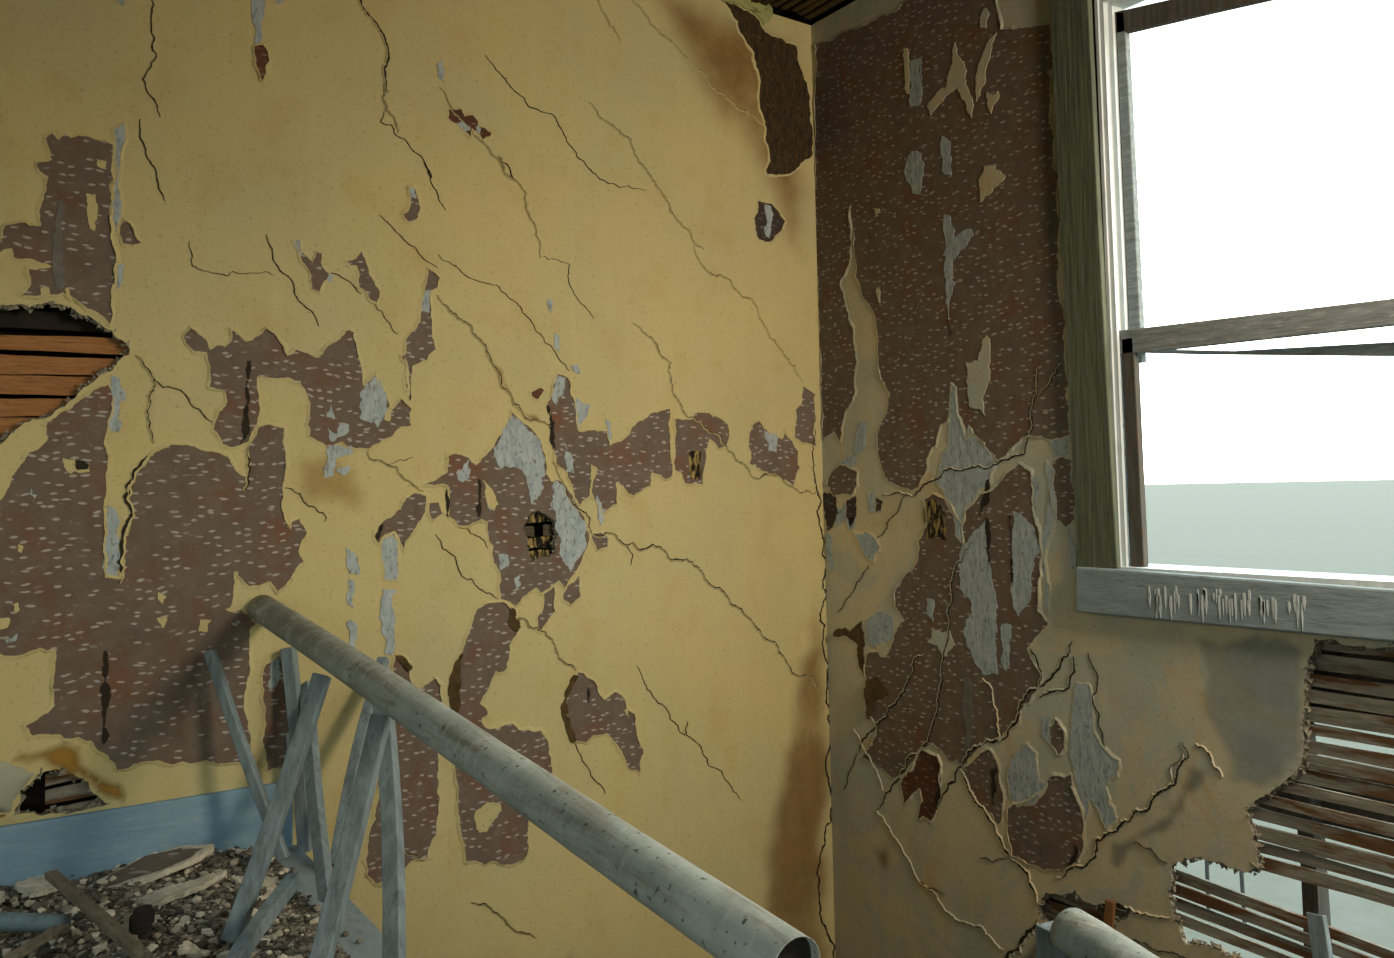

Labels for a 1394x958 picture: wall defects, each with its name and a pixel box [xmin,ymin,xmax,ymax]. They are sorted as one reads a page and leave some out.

crack [139,0,165,200]
peeling [251,0,283,86]
crack [357,0,446,210]
crack [380,215,570,427]
crack [485,55,803,382]
crack [116,355,213,583]
peeling [0,130,442,772]
peeling [371,0,1123,874]
crack [552,323,1224,958]
peeling [362,776,382,888]
spalling [1036,892,1130,926]
spalling [1167,639,1394,958]